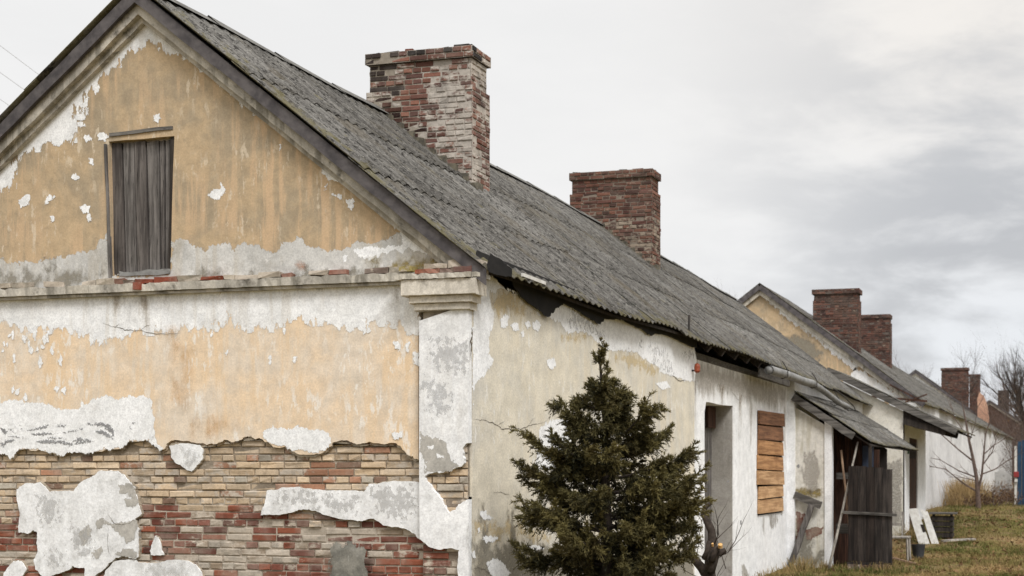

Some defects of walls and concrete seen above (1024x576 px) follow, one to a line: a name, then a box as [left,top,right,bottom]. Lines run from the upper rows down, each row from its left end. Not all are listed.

peeling [0,25,203,193]
peeling [18,194,30,209]
peeling [0,226,447,368]
peeling [472,276,697,405]
flaking render [0,386,511,576]